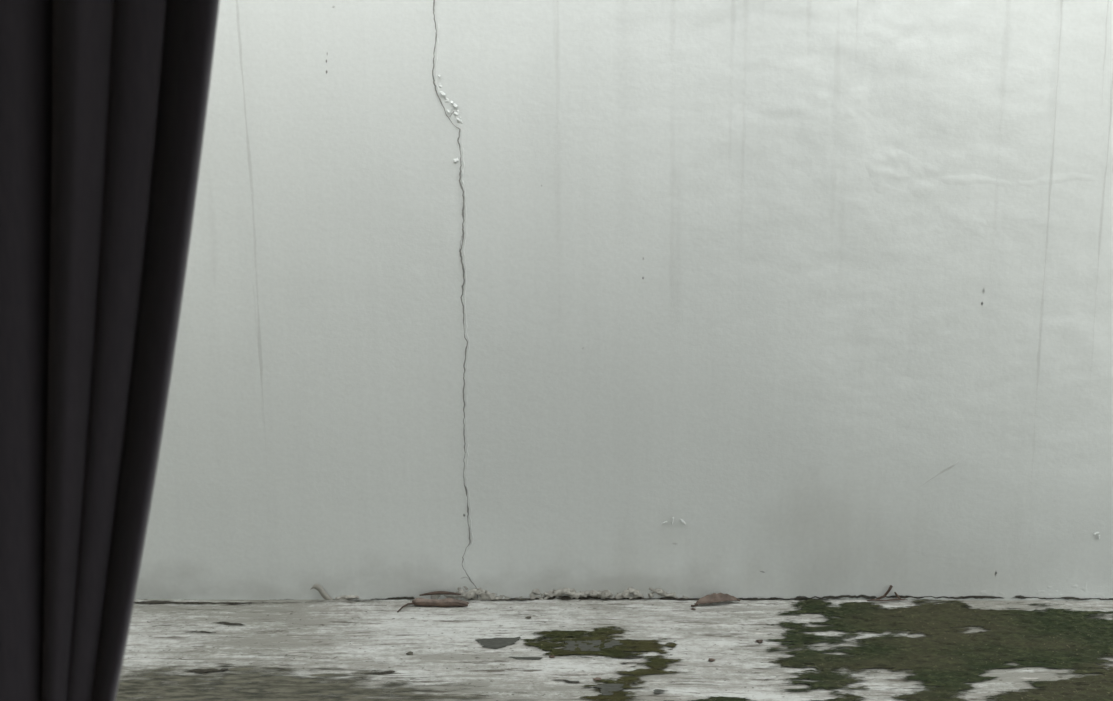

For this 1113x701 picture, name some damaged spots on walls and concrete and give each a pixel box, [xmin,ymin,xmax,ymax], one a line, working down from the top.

crack [432,0,700,601]
crack [134,599,294,633]
crack [333,595,415,603]
crack [738,593,1113,601]